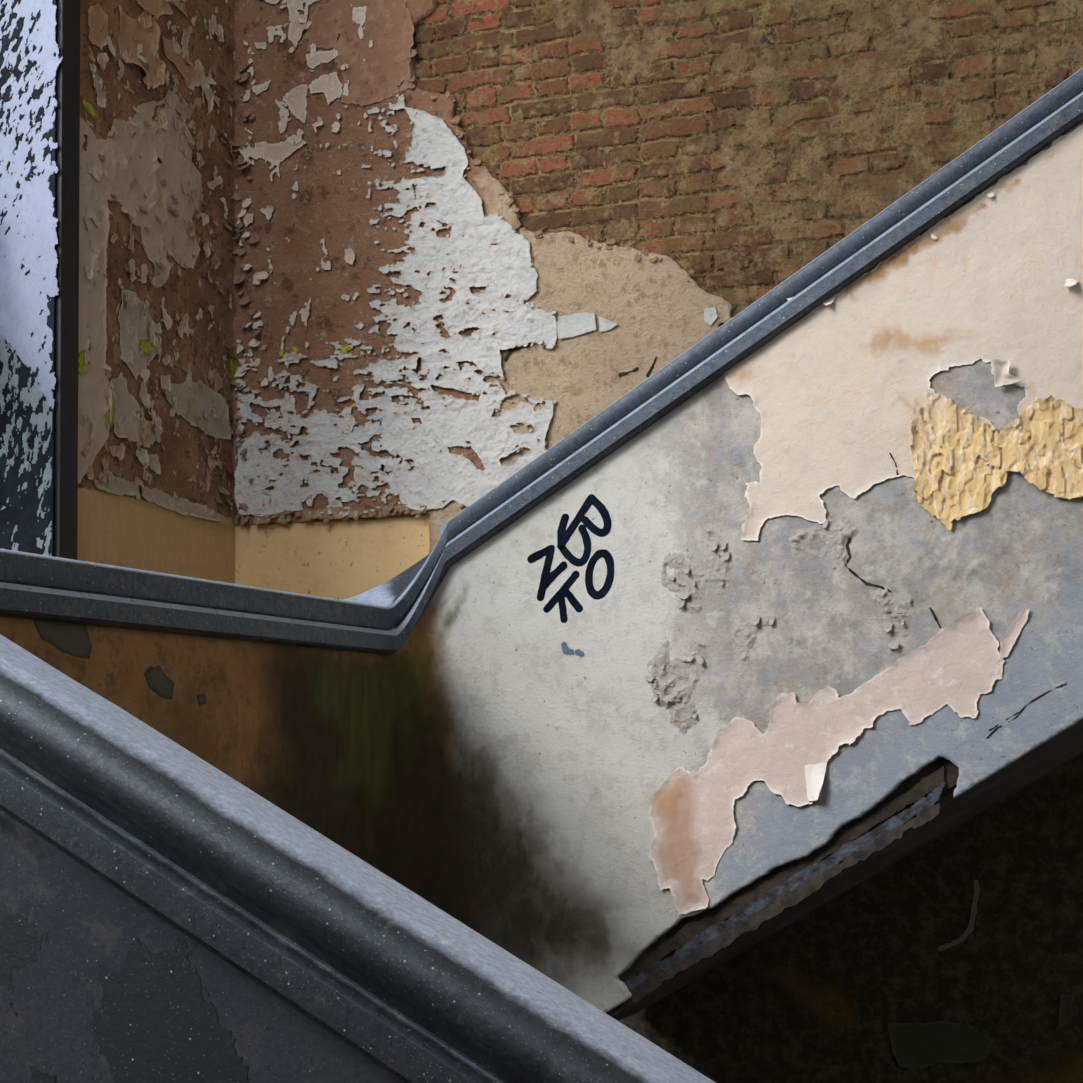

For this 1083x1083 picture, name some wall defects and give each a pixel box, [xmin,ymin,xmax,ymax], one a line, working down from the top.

peeling [0,0,63,556]
spalling [78,0,1083,541]
peeling [606,607,1030,1016]
crack [845,538,891,593]
crack [929,607,942,629]
crack [986,683,1067,739]